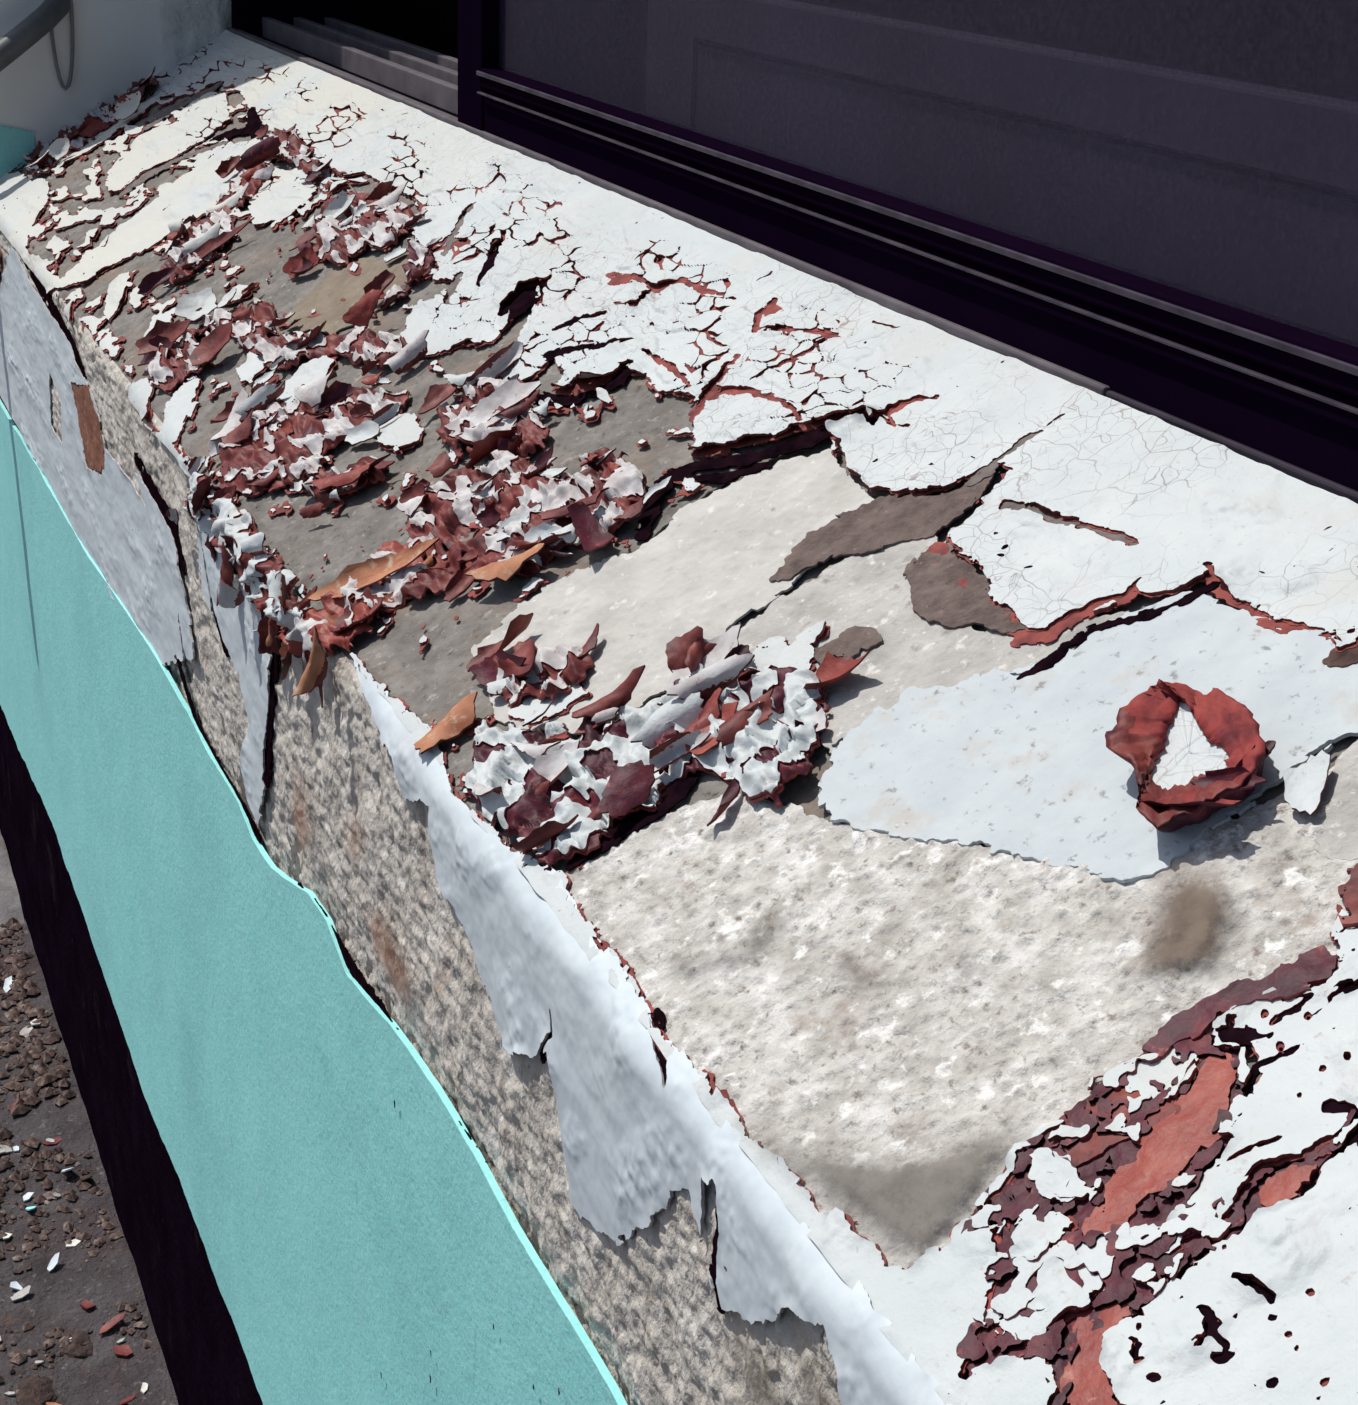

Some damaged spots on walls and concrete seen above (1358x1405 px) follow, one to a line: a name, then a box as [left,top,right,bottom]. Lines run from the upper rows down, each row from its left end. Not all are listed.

peeling [18,66,249,279]
spalling [0,231,48,306]
peeling [50,122,741,796]
crack [441,202,838,542]
crack [865,399,925,427]
crack [967,415,1138,546]
crack [926,542,1358,680]
peeling [253,432,1358,1405]
leakage [1146,877,1224,965]
crack [1211,982,1358,1089]
crack [1211,1137,1282,1168]
crack [1322,1100,1358,1153]